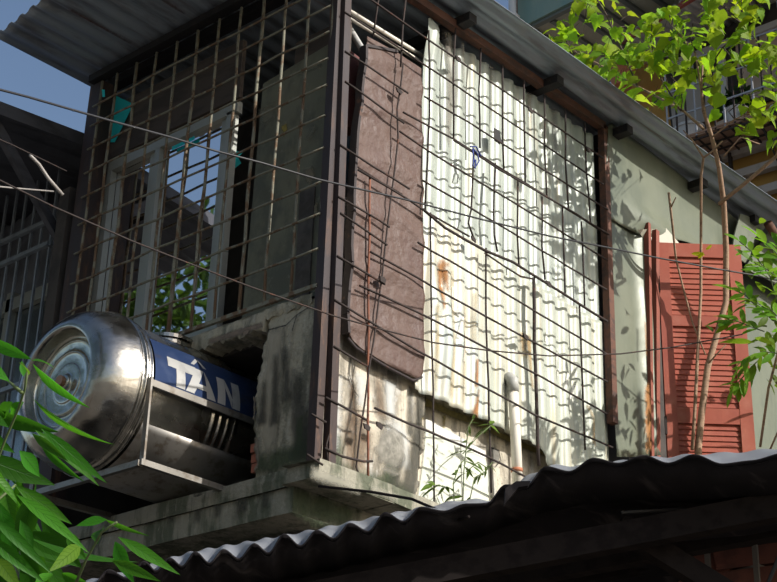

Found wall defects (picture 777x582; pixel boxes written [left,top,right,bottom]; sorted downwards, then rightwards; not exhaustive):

rust [438,260,449,308]
damp [257,327,310,456]
spalling [250,437,259,475]
damp [314,470,353,488]
damp [336,373,425,498]